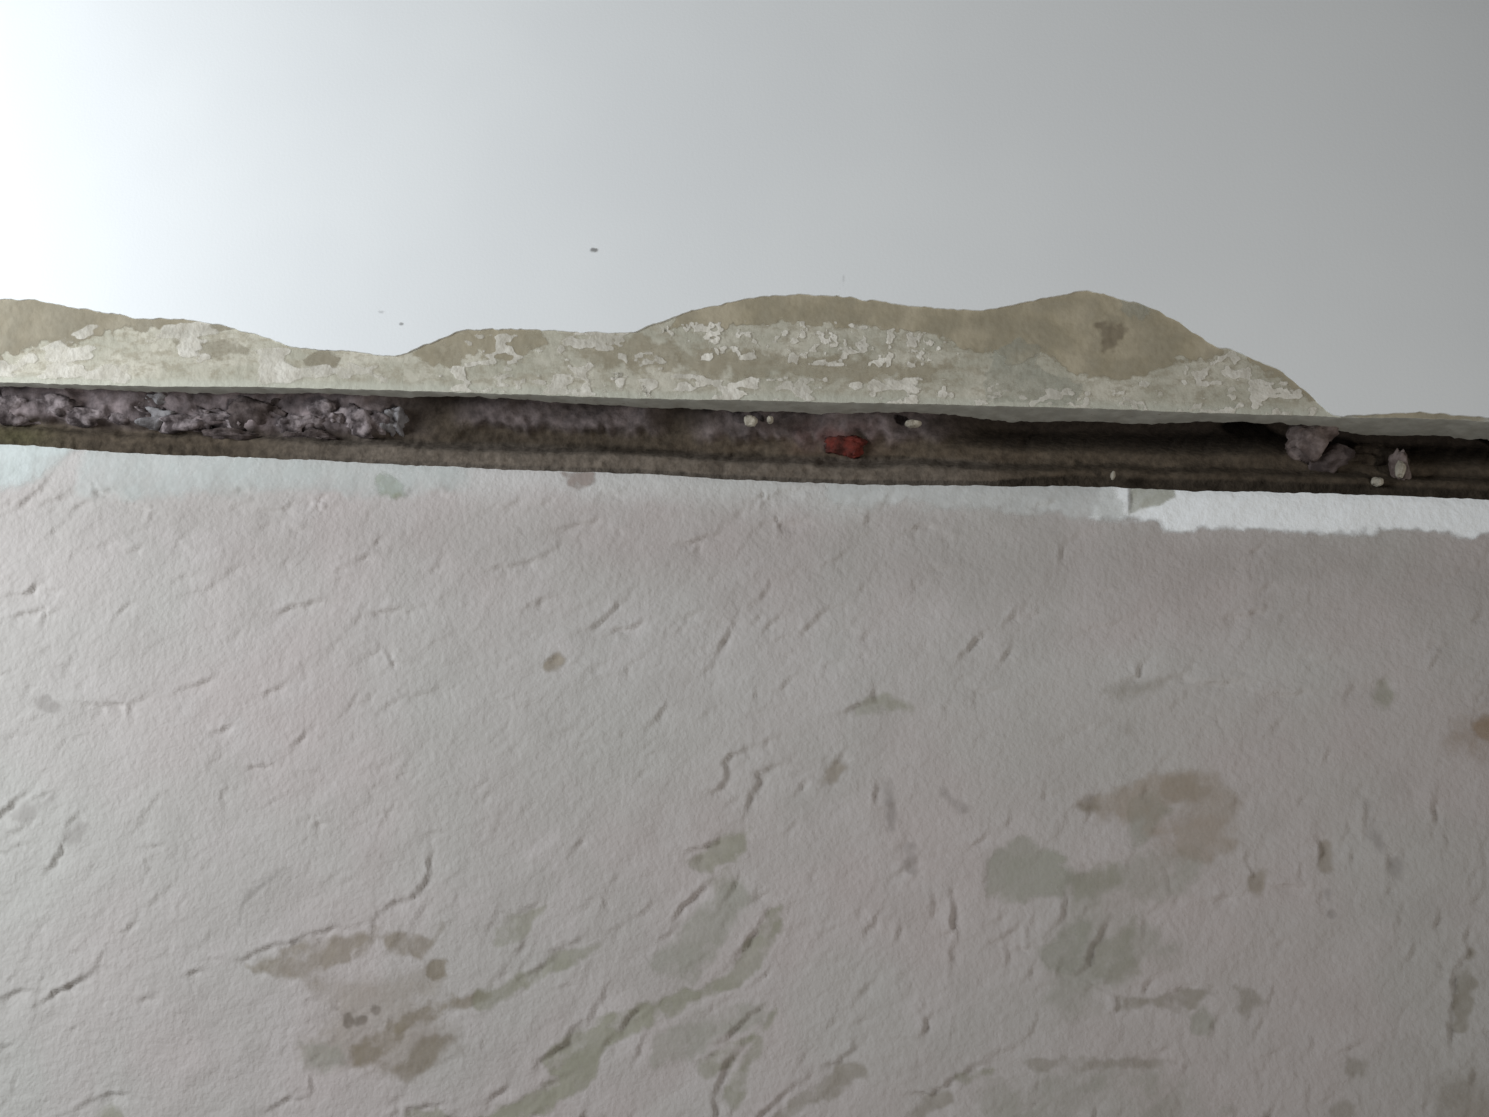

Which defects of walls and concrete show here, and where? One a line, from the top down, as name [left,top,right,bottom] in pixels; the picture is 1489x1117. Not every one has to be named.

peeling [0,291,1482,421]